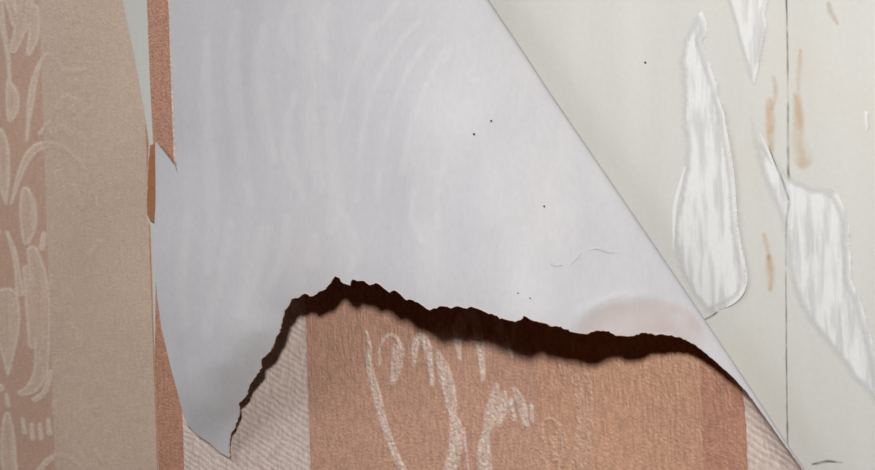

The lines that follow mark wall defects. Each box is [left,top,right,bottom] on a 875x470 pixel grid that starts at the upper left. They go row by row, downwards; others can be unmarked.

flaking render [672,11,748,313]
flaking render [729,0,768,86]
flaking render [759,133,875,396]